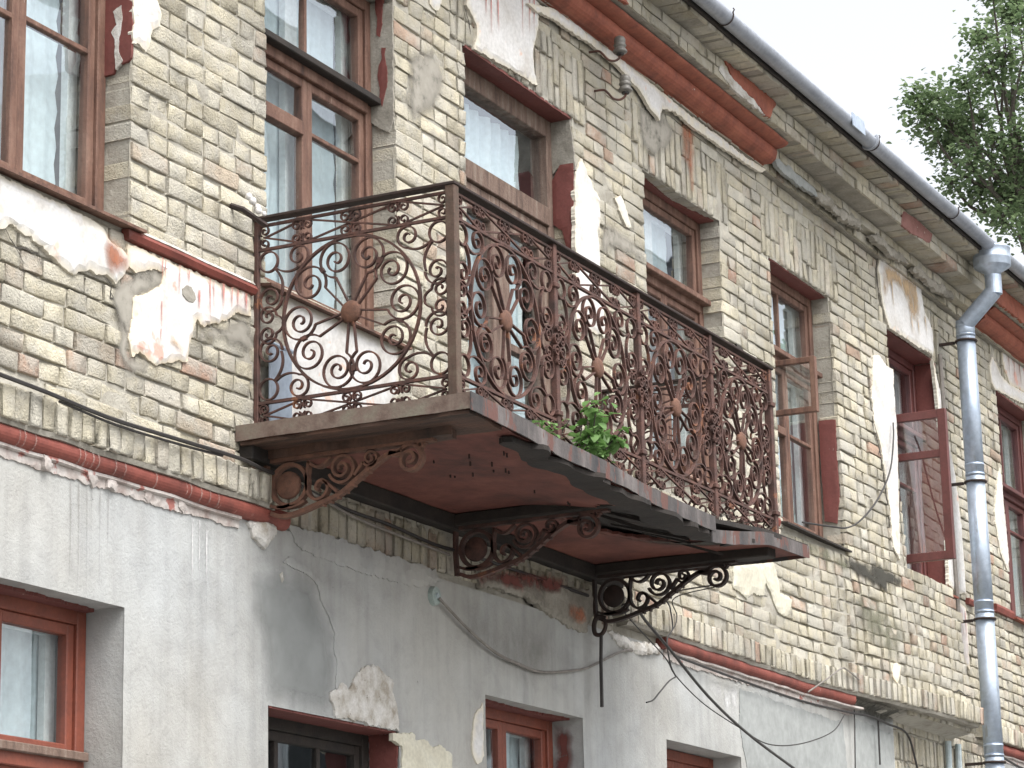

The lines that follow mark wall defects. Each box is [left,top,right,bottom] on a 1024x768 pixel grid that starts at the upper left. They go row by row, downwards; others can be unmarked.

peeling [104,0,162,77]
flaking render [464,0,766,173]
flaking render [0,175,251,366]
flaking render [552,159,605,337]
flaking render [811,192,954,428]
flaking render [868,355,900,561]
flaking render [944,438,970,671]
flaking render [329,664,452,768]